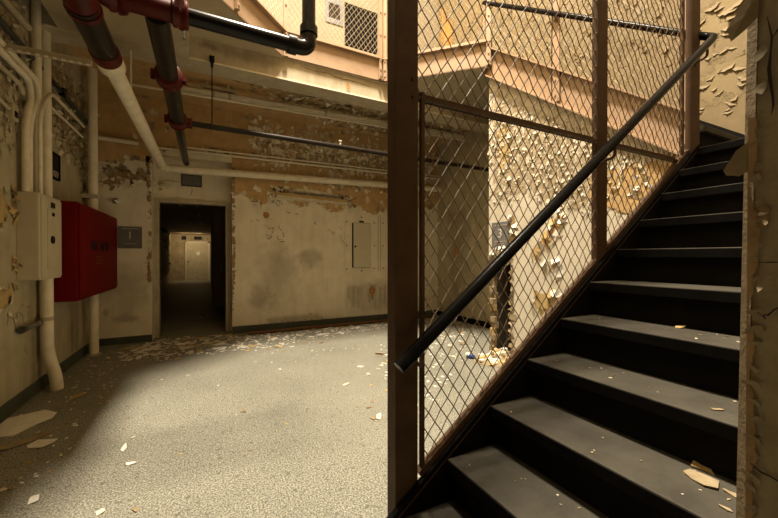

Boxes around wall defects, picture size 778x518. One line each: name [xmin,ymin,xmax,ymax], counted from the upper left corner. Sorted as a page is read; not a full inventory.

peeling [0,57,26,156]
peeling [700,0,768,114]
peeling [51,45,387,310]
peeling [418,119,470,210]
peeling [487,85,592,277]
peeling [607,143,678,214]
peeling [722,116,770,518]